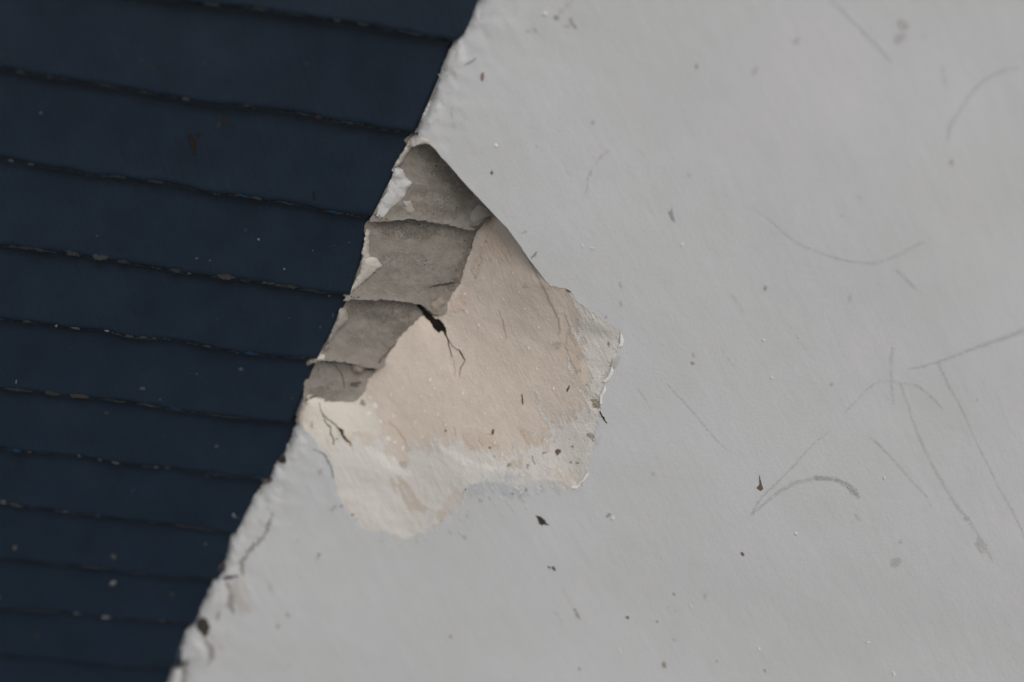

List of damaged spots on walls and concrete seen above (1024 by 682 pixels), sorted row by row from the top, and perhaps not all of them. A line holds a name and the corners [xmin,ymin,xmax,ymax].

spalling [170,0,624,680]